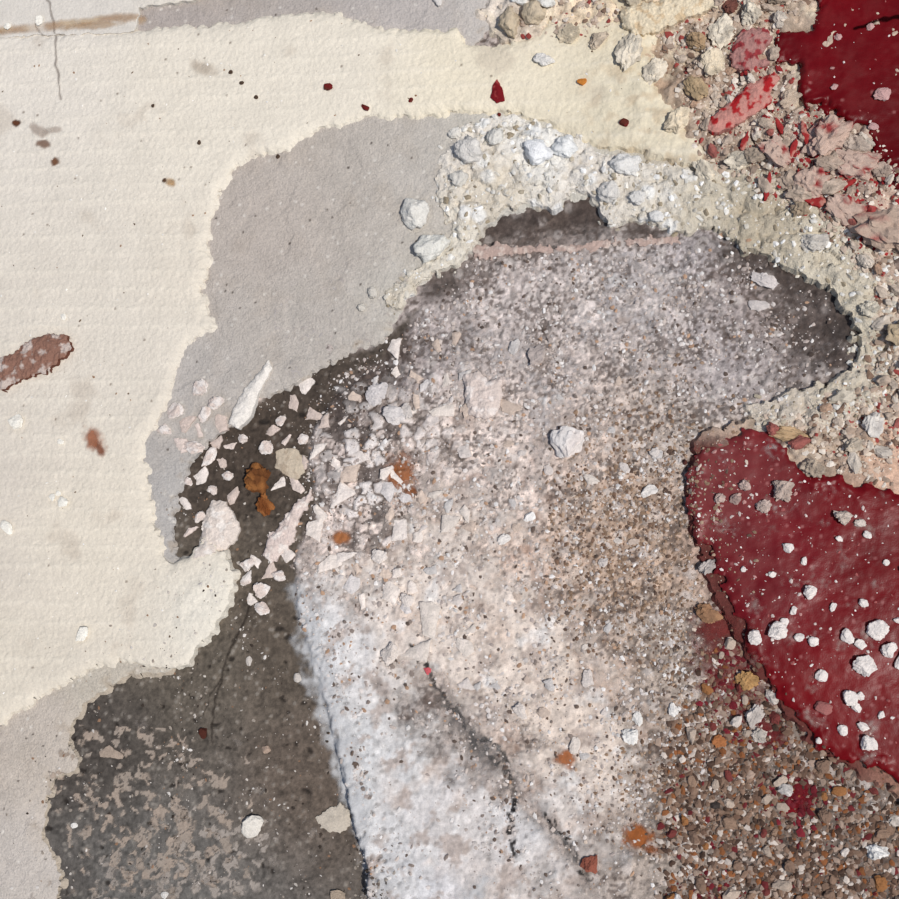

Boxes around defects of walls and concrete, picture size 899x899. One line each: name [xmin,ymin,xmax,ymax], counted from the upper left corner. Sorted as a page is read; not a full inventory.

spalling [645,0,840,175]
peeling [465,203,543,261]
peeling [568,190,599,209]
peeling [143,80,506,564]
spalling [682,416,755,467]
spalling [775,331,899,494]
spalling [687,515,899,799]
peeling [0,659,176,899]
flaking render [241,815,264,838]
flaking render [315,802,351,833]
crack [410,644,518,856]
crack [544,813,592,881]